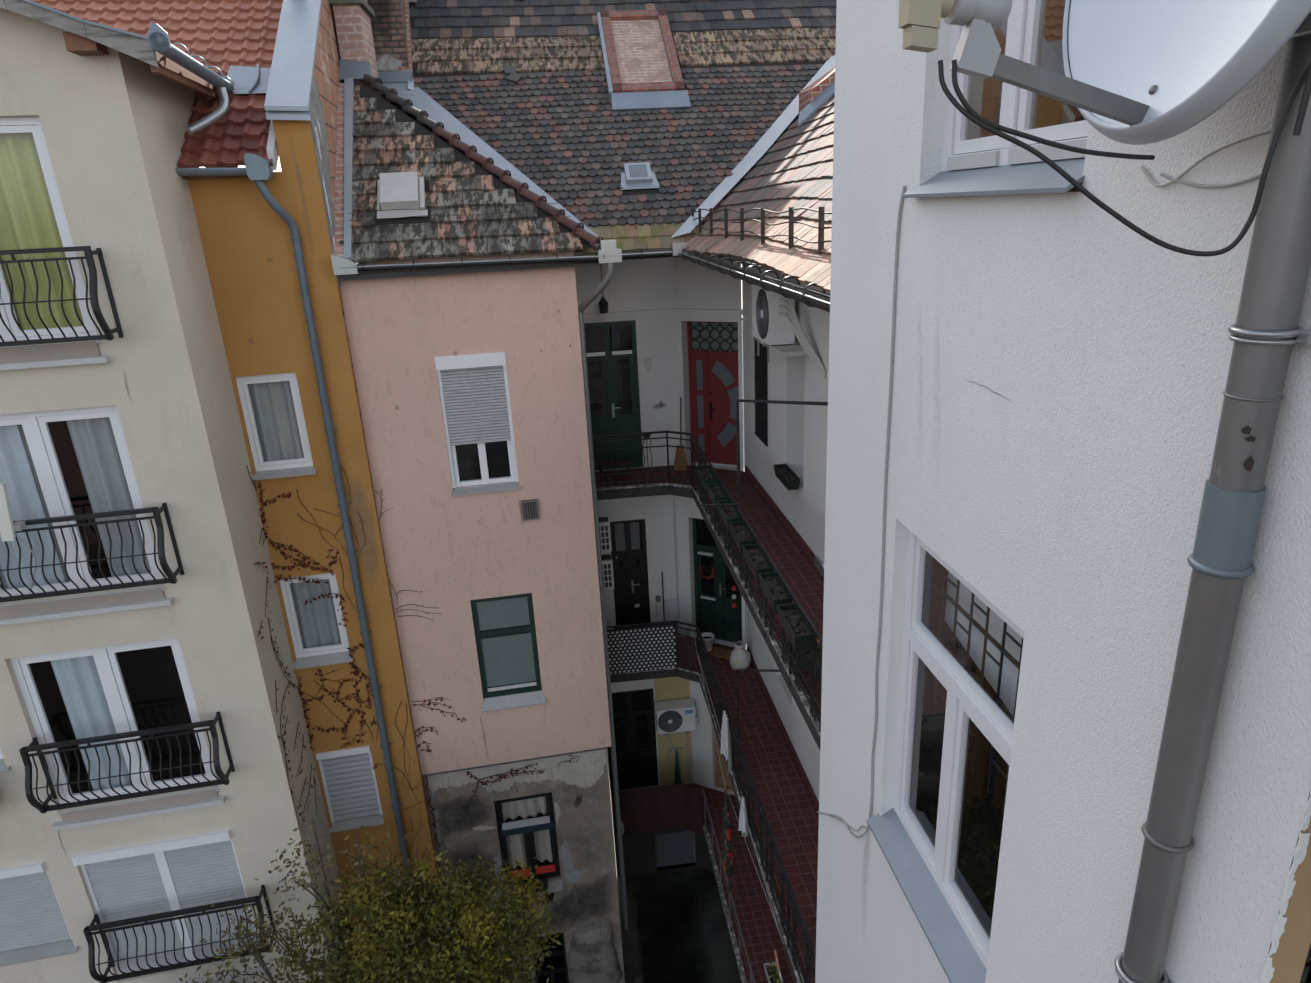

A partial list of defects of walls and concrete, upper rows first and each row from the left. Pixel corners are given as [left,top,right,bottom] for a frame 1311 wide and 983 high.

peeling [427,749,606,864]
peeling [545,840,584,903]
peeling [1260,785,1311,983]